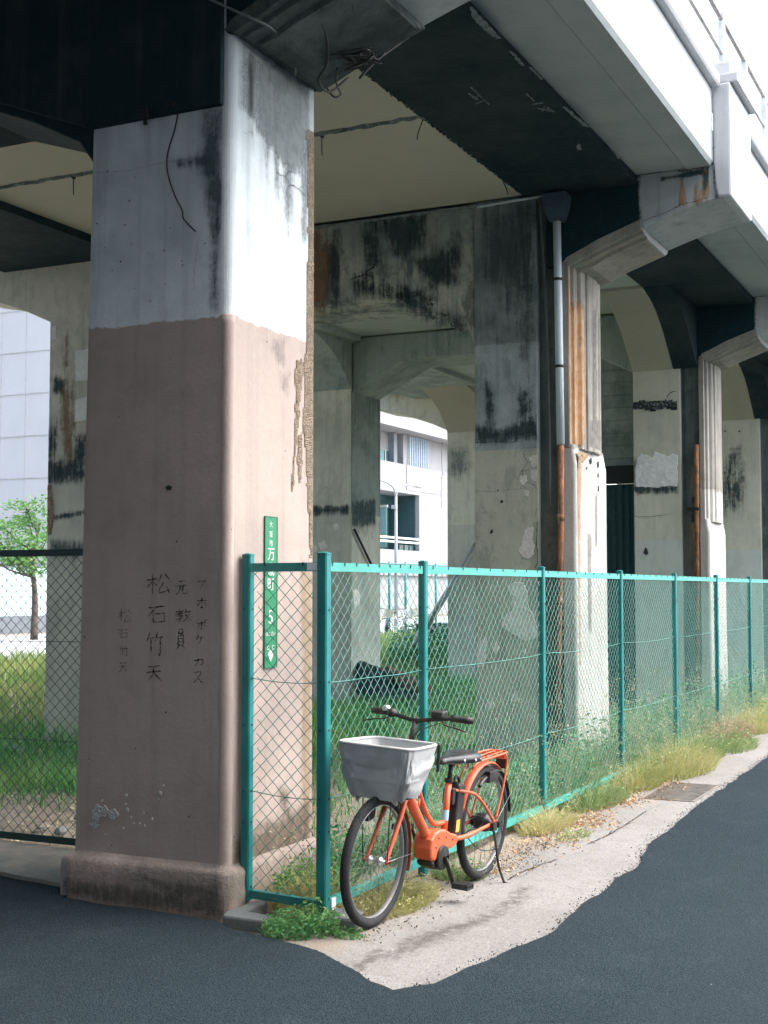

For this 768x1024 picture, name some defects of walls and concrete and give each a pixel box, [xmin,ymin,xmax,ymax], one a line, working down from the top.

damp [241,52,309,236]
damp [354,214,467,326]
spalling [291,129,327,558]
corrosion [569,290,585,445]
corrosion [61,390,75,460]
damp [475,381,537,442]
peeling [519,454,537,496]
peeling [635,451,678,488]
mould [723,453,744,510]
damp [313,499,375,528]
peeling [519,527,535,560]
peeling [89,794,153,835]